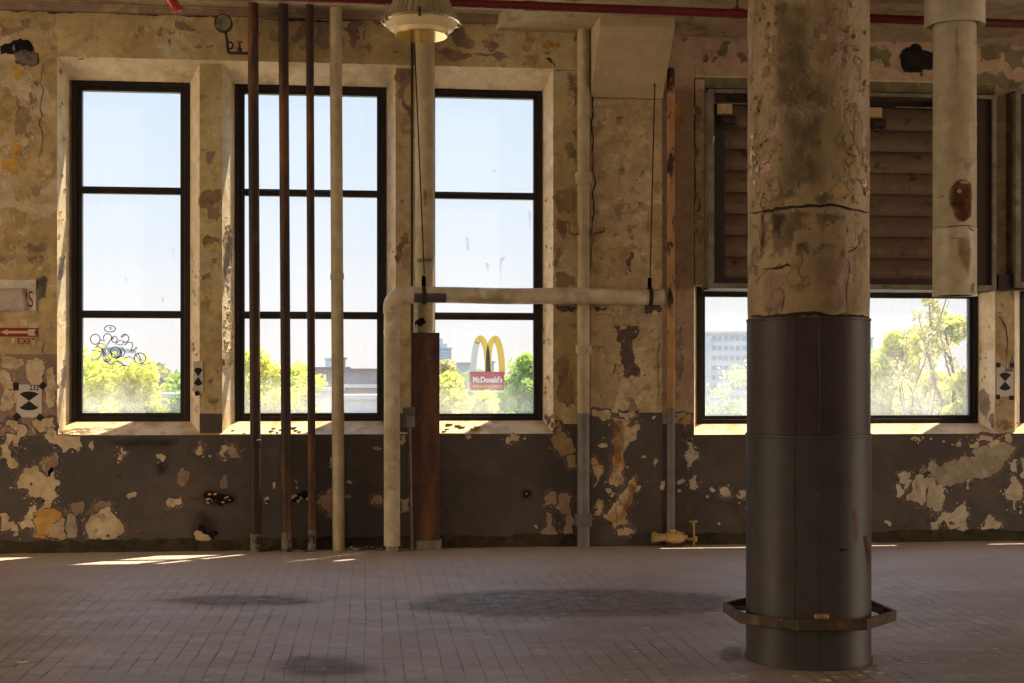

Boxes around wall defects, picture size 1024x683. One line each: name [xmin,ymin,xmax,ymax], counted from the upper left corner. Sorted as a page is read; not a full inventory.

peeling [0,15,43,176]
spalling [870,41,933,77]
crack [750,203,869,214]
corrosion [950,179,972,221]
peeling [0,209,66,300]
peeling [612,305,663,382]
peeling [0,347,130,542]
peeling [192,438,244,462]
peeling [590,322,746,539]
peeling [892,347,1024,531]
spalling [194,525,219,541]
peeling [533,488,575,535]